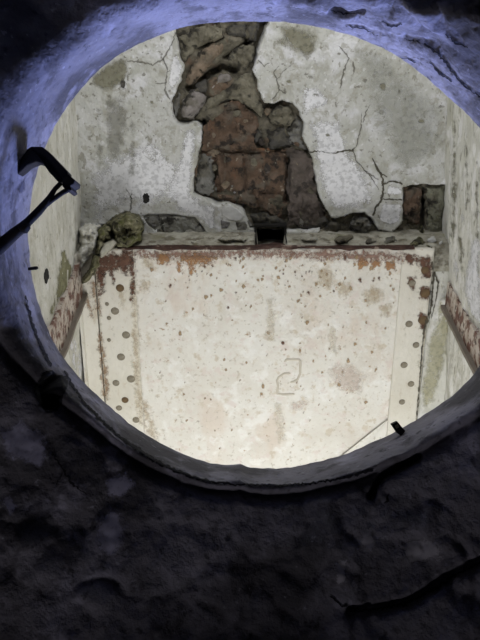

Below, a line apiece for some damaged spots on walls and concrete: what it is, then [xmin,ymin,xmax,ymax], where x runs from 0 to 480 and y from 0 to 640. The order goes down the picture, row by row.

damp [94,59,127,88]
crack [127,33,176,99]
flaking render [172,21,445,248]
crack [309,109,404,216]
flaking render [144,215,205,233]
rust [87,249,432,317]
rust [98,332,110,399]